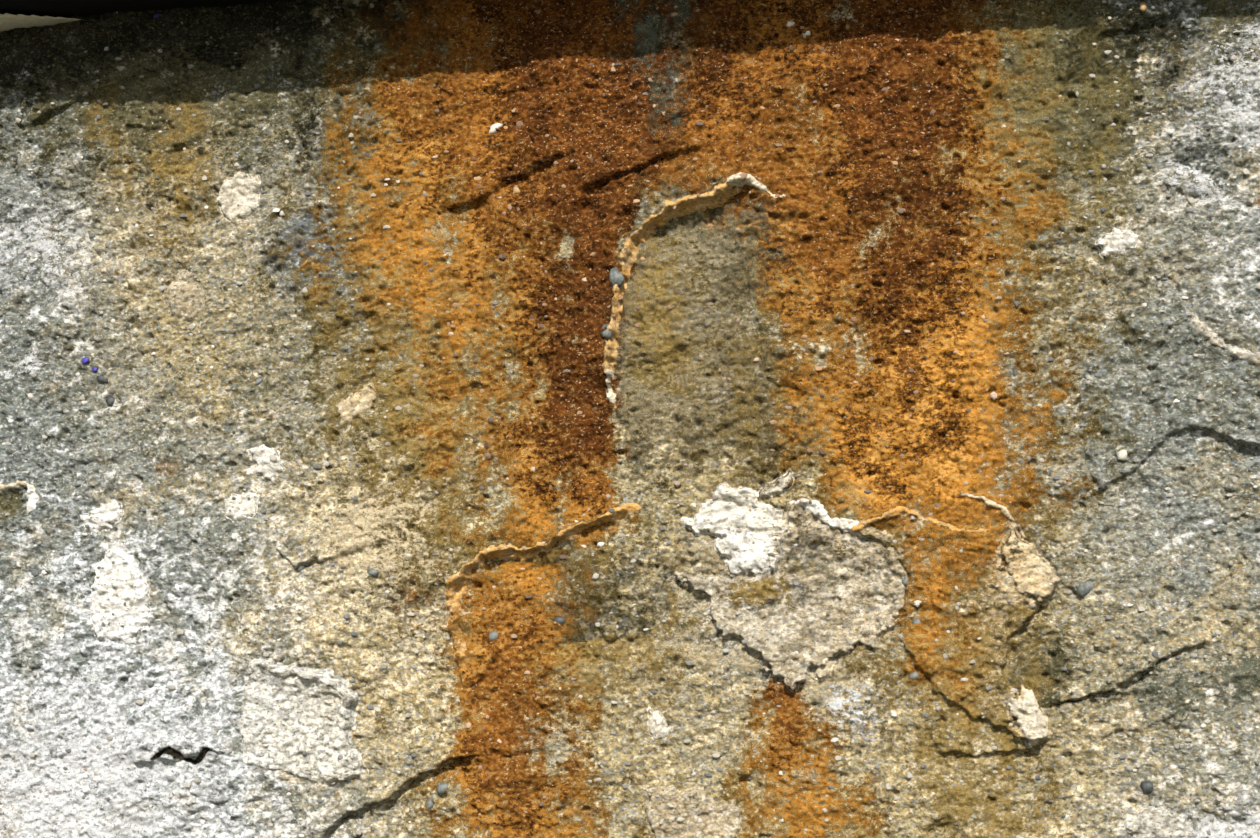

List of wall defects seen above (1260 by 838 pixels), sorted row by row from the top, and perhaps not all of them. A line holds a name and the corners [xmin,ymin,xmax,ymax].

corrosion [252,0,1183,838]
peeling [602,172,908,705]
crack [150,746,210,765]
peeling [1007,696,1048,748]